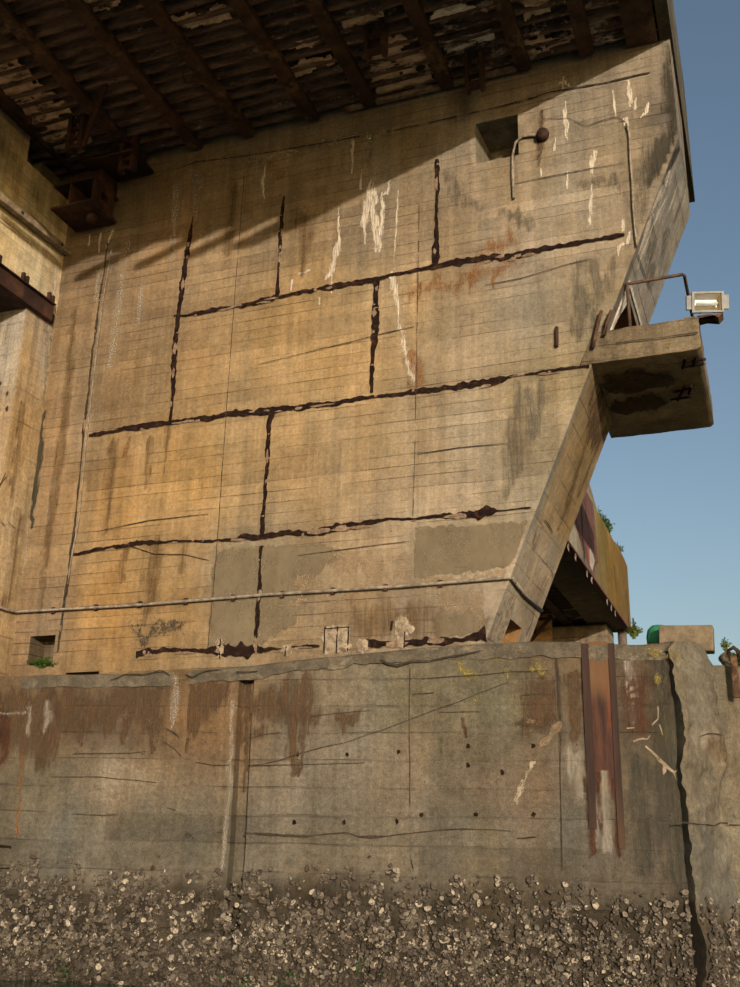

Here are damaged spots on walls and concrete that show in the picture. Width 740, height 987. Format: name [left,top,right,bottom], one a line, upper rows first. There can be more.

spalling [0,59,93,157]
spalling [171,3,232,29]
spalling [369,34,434,97]
spalling [430,3,476,20]
spalling [442,29,495,54]
damp [612,45,686,277]
damp [321,135,415,381]
crack [616,332,698,343]
crack [73,159,624,680]
damp [561,369,676,562]
crack [55,625,563,871]
corrosion [583,763,621,857]